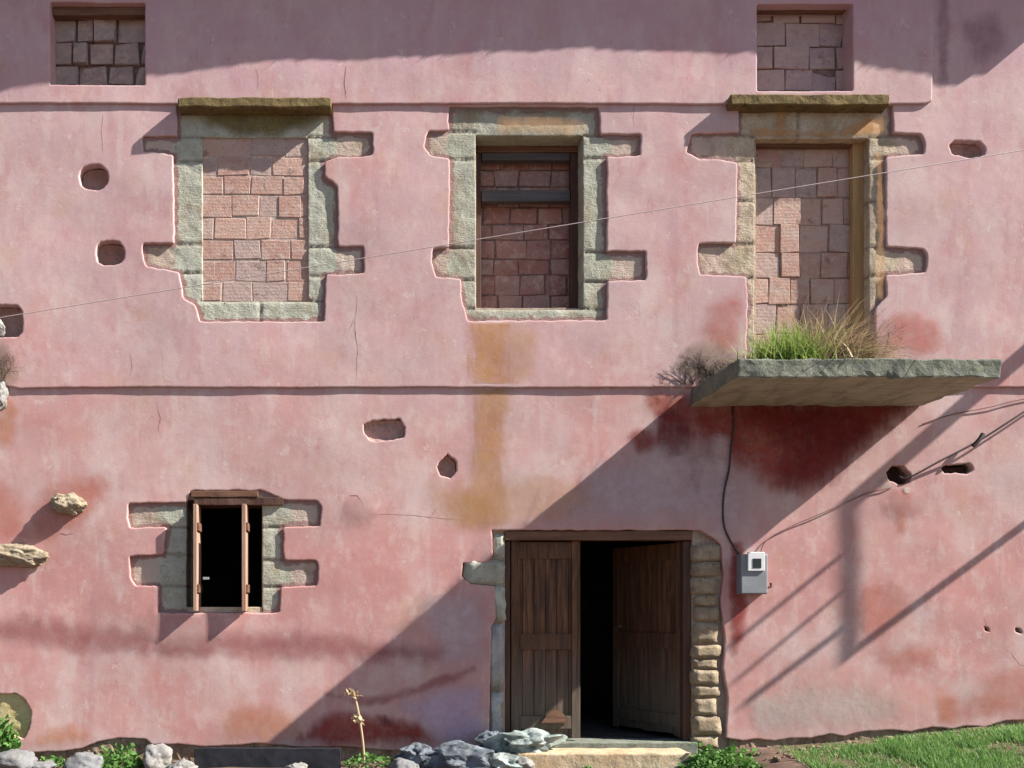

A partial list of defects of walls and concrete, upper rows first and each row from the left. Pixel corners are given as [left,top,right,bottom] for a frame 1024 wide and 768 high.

hole [364,421,404,441]
hole [438,456,455,478]
damp [590,400,896,526]
spalling [0,694,32,738]
damp [308,676,479,744]